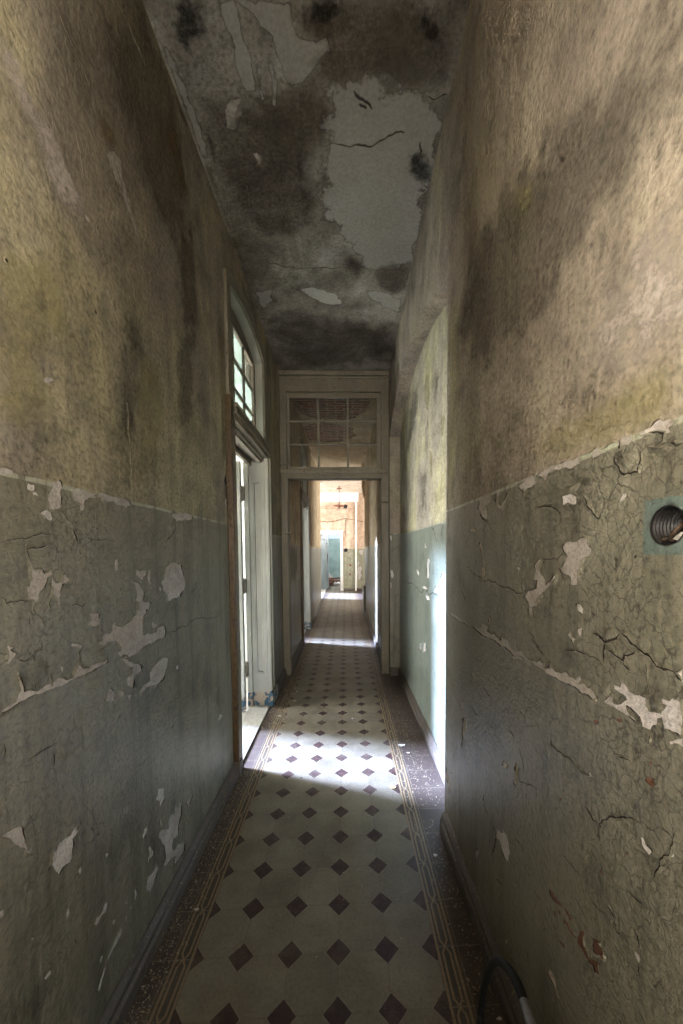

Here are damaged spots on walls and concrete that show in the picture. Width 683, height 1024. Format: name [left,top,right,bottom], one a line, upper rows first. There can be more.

leakage [5,54,82,212]
leakage [206,95,327,234]
crack [353,91,373,109]
crack [322,130,423,160]
flaking render [318,72,442,270]
mould [410,153,431,182]
leakage [596,234,683,354]
peeling [477,416,679,523]
crack [613,429,683,477]
peeling [0,558,186,717]
crack [404,567,683,683]
peeling [448,609,683,747]